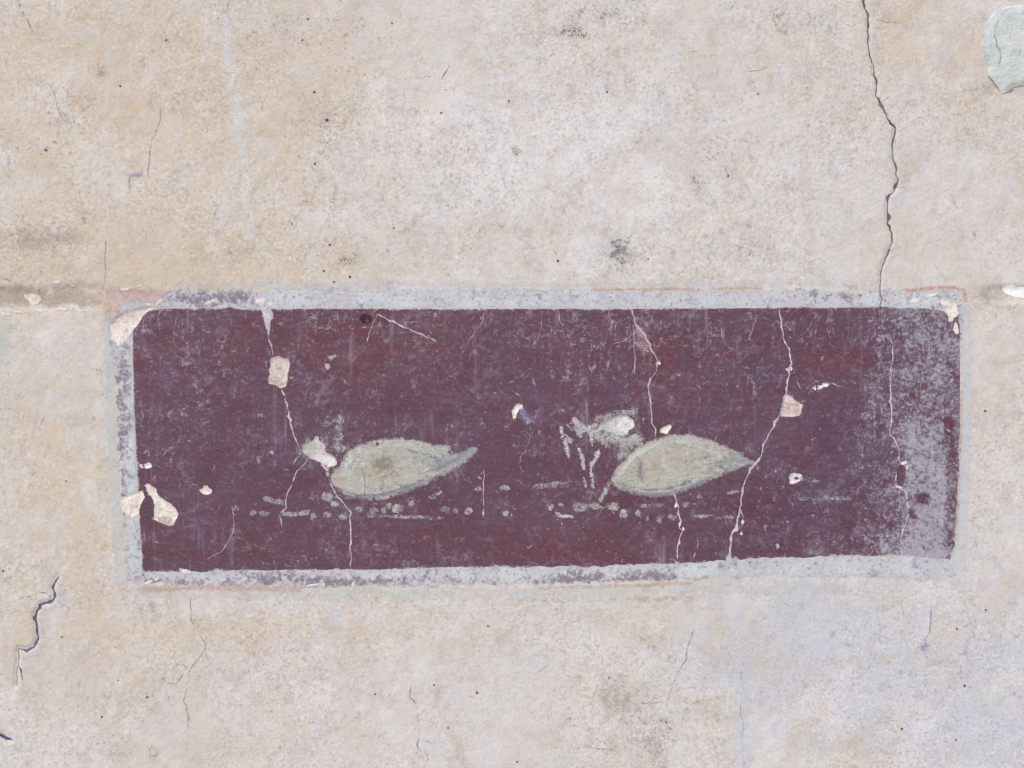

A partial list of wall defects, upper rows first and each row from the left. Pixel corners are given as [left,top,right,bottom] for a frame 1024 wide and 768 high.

crack [862,0,905,461]
spalling [101,285,172,346]
spalling [268,356,290,388]
crack [280,389,308,525]
spalling [296,410,355,476]
crack [534,308,661,437]
crack [725,309,817,565]
spalling [780,382,840,417]
spalling [119,483,178,526]
crack [329,480,359,566]
crack [898,488,909,556]
crack [16,574,67,681]